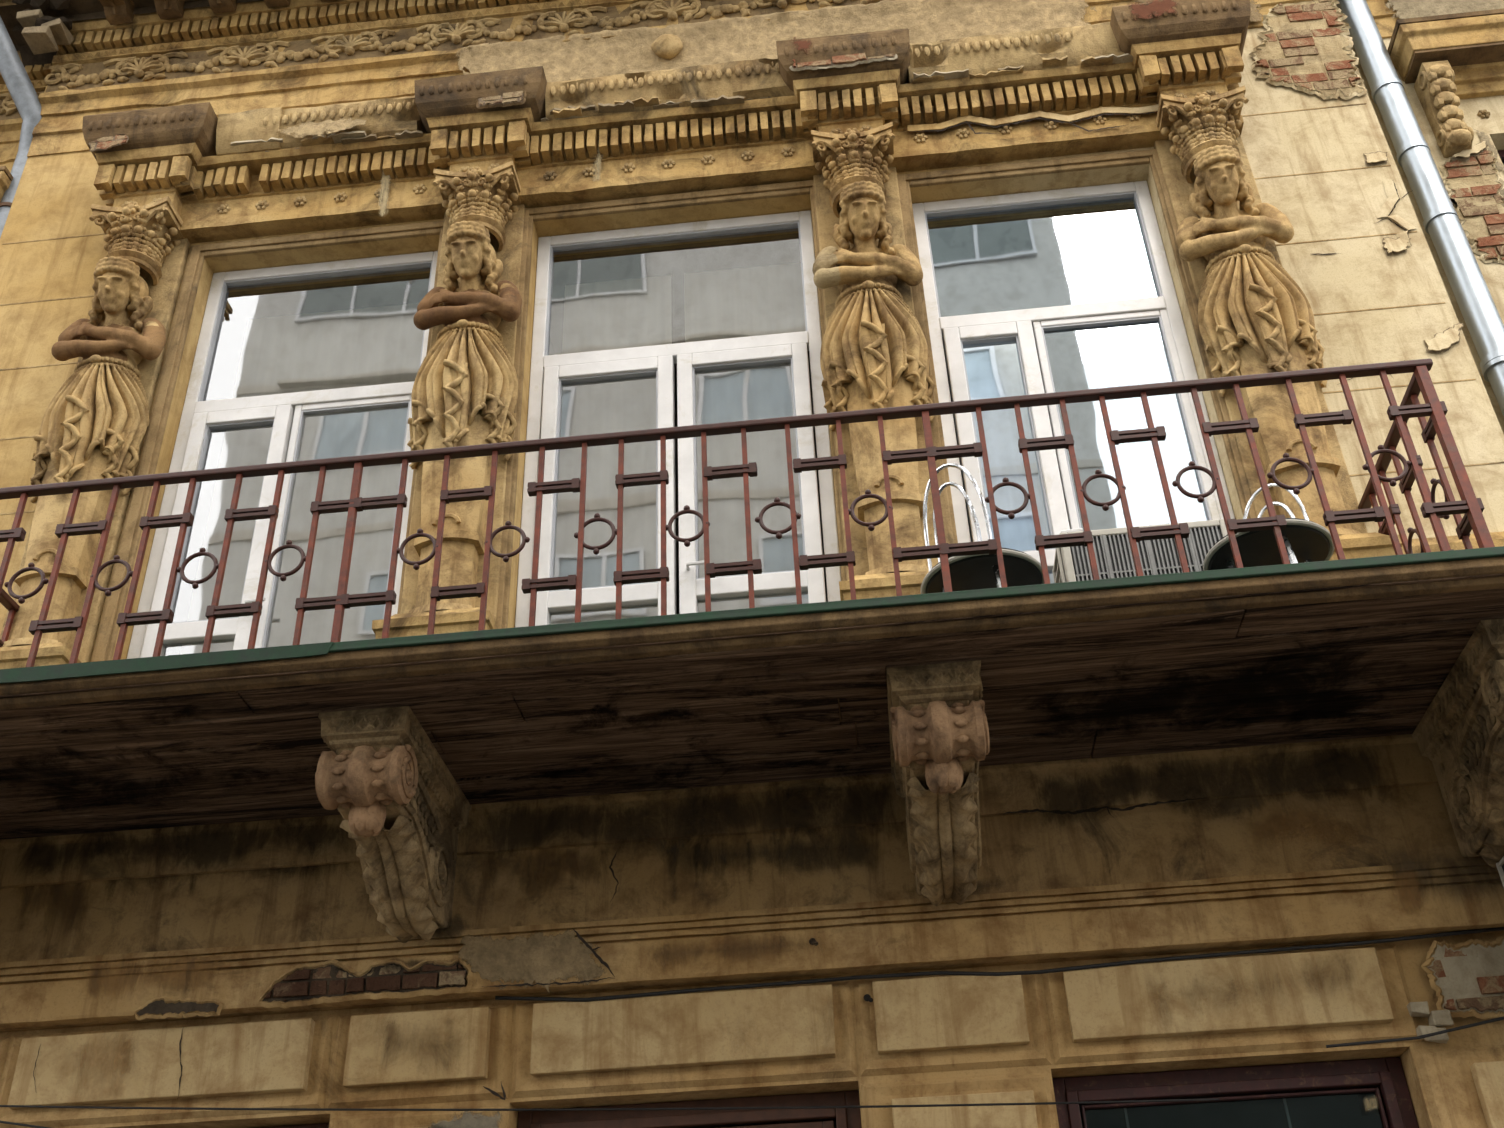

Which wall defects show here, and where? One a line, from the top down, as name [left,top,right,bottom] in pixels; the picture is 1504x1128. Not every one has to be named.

flaking render [1249,0,1367,100]
flaking render [1439,129,1504,264]
flaking render [1423,323,1463,354]
leakage [1024,641,1384,739]
leakage [0,749,299,809]
leakage [24,819,343,916]
leakage [488,754,891,890]
leakage [1043,749,1385,823]
leakage [1394,853,1503,891]
flaking render [134,996,224,1021]
flaking render [257,929,606,1009]
spalling [1407,934,1504,1044]